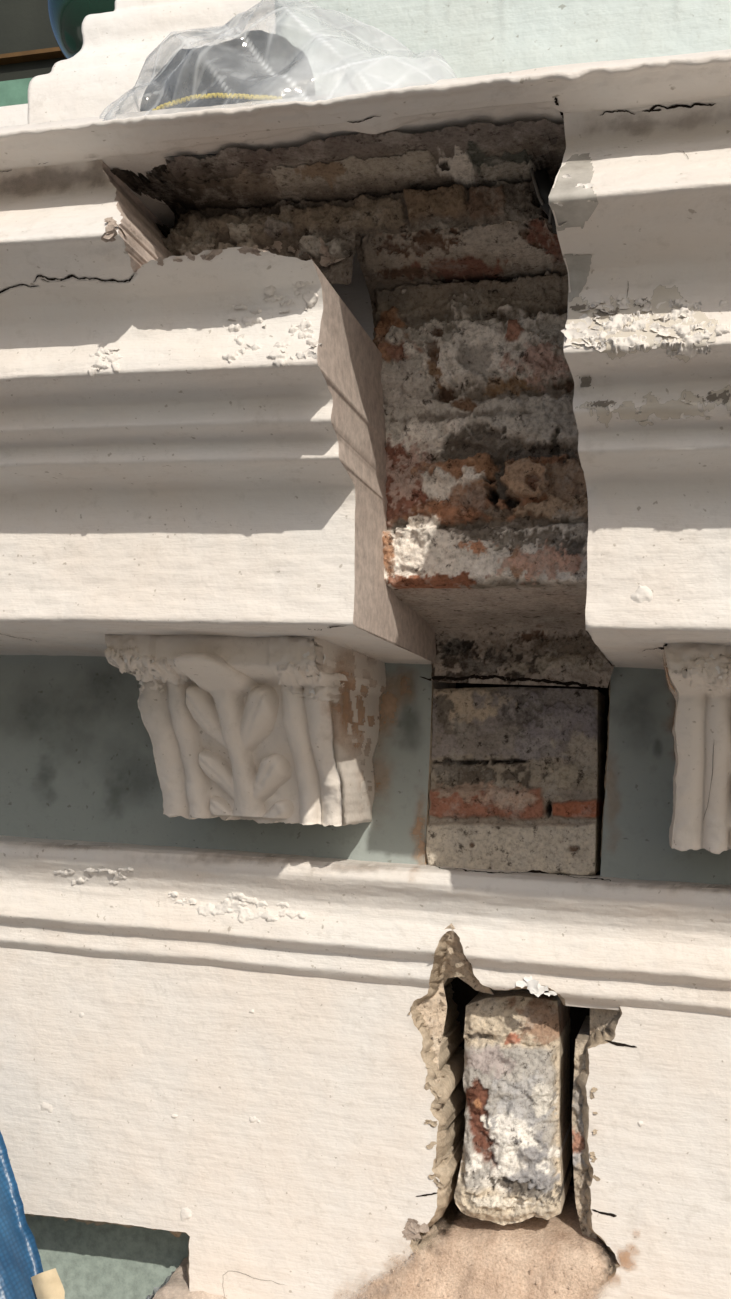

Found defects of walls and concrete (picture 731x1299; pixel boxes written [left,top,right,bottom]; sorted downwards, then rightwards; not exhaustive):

spalling [110,118,598,285]
spalling [101,217,127,242]
crack [0,273,139,298]
peeling [561,254,722,363]
peeling [105,639,189,694]
peeling [277,651,345,703]
spalling [516,976,557,997]
flaking render [408,923,494,1188]
spalling [572,1008,619,1274]
spalling [402,1218,429,1240]